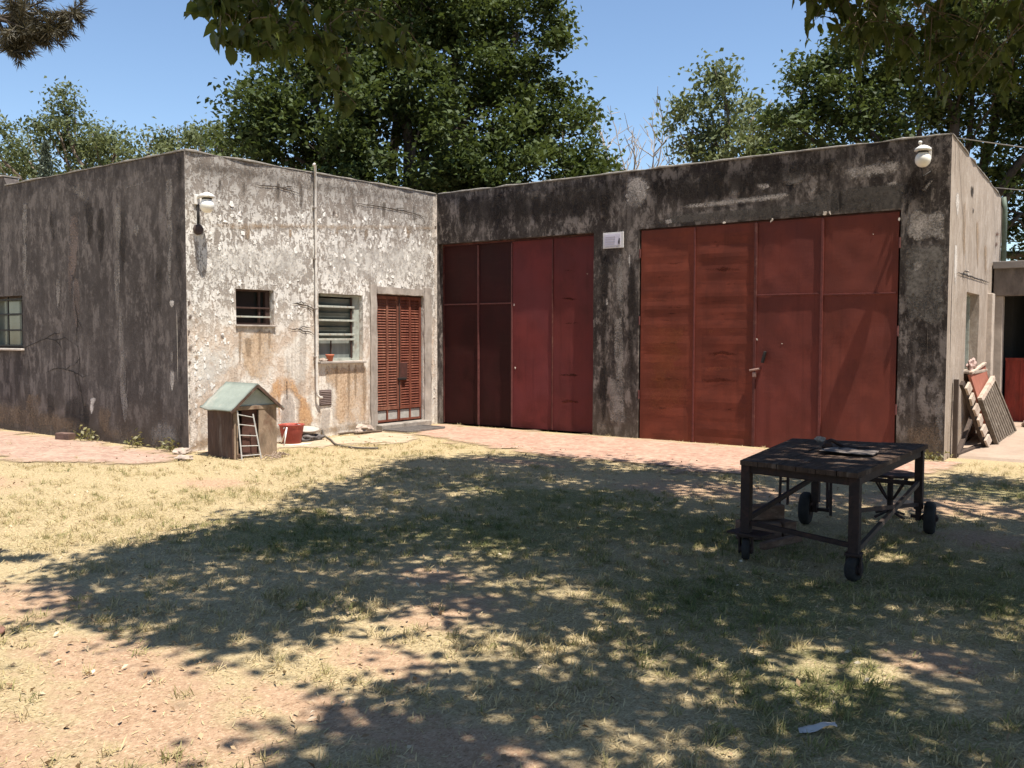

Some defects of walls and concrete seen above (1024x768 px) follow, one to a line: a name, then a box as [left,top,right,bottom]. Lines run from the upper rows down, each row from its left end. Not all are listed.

water stain [156,166,181,286]
water stain [459,184,613,225]
water stain [56,187,127,419]
peeling [188,197,437,447]
water stain [0,395,117,433]
rust [271,379,312,426]